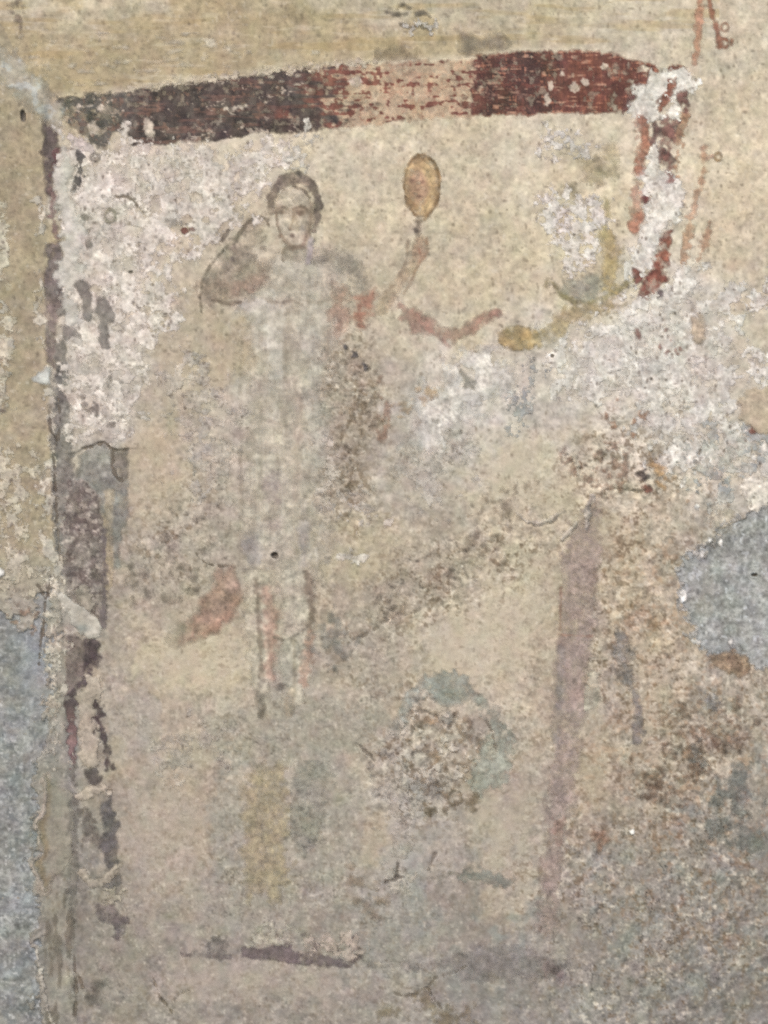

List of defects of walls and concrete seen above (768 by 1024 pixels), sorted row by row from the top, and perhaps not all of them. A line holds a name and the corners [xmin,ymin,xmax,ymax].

damp [57,308,80,340]
damp [74,280,115,349]
damp [395,346,552,512]
damp [676,420,768,528]
peeling [0,118,323,1024]